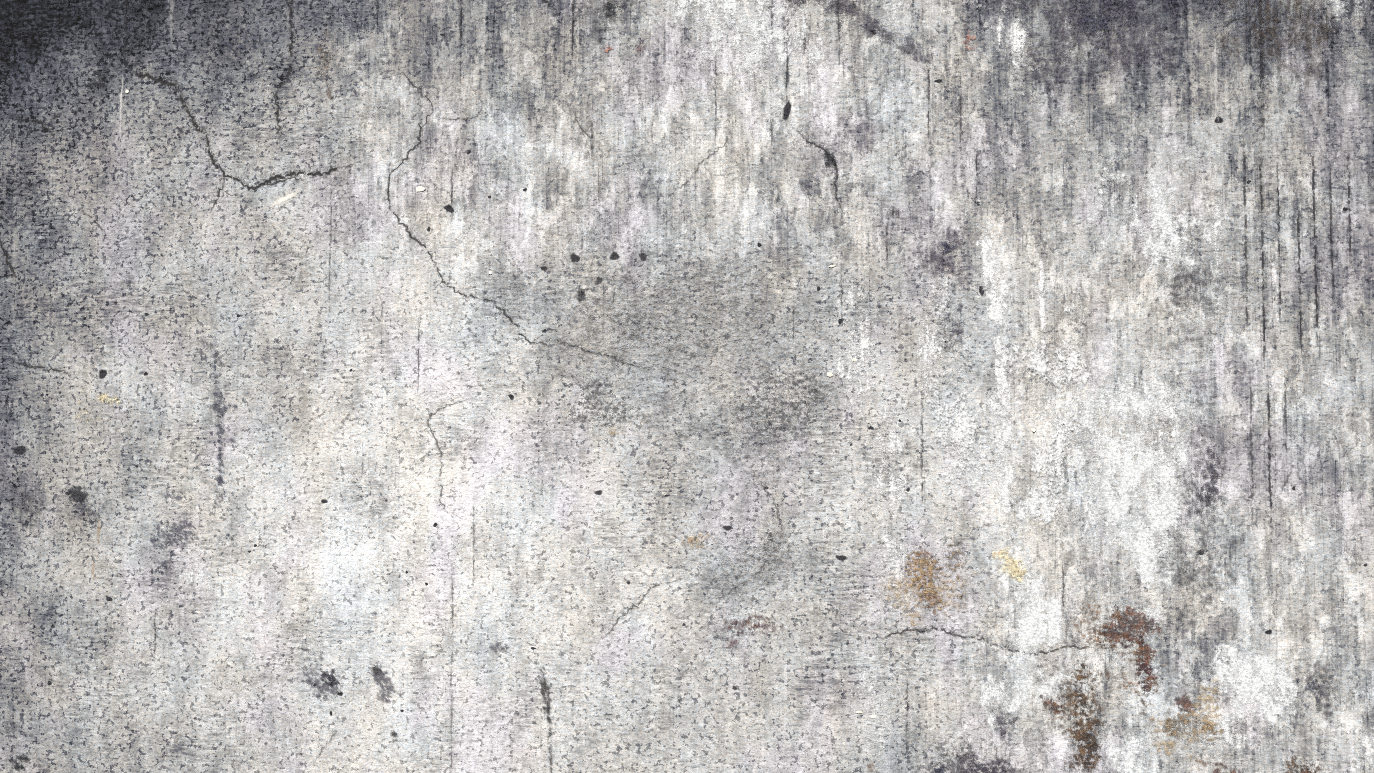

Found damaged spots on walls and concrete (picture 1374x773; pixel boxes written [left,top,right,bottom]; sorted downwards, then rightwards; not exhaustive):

leakage [985,0,1226,90]
crack [136,72,337,206]
crack [387,75,633,365]
leakage [1037,260,1083,384]
leakage [1167,187,1223,346]
corrosion [906,545,961,615]
crack [885,626,1084,656]
corrosion [1040,604,1161,770]
corrosion [1163,695,1232,740]
corrosion [1285,756,1320,773]